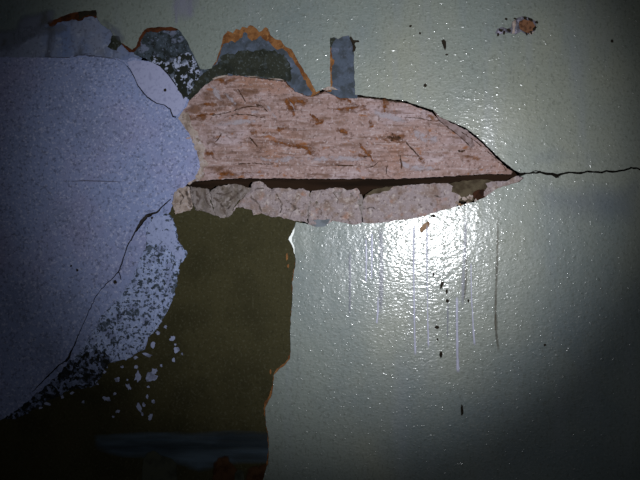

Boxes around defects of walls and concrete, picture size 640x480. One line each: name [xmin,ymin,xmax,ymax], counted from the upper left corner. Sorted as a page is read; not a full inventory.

crack [36,199,171,388]
crack [127,66,176,118]
flaking render [0,10,320,480]
flaking render [172,36,523,227]
spalling [495,16,538,36]
crack [519,167,640,178]